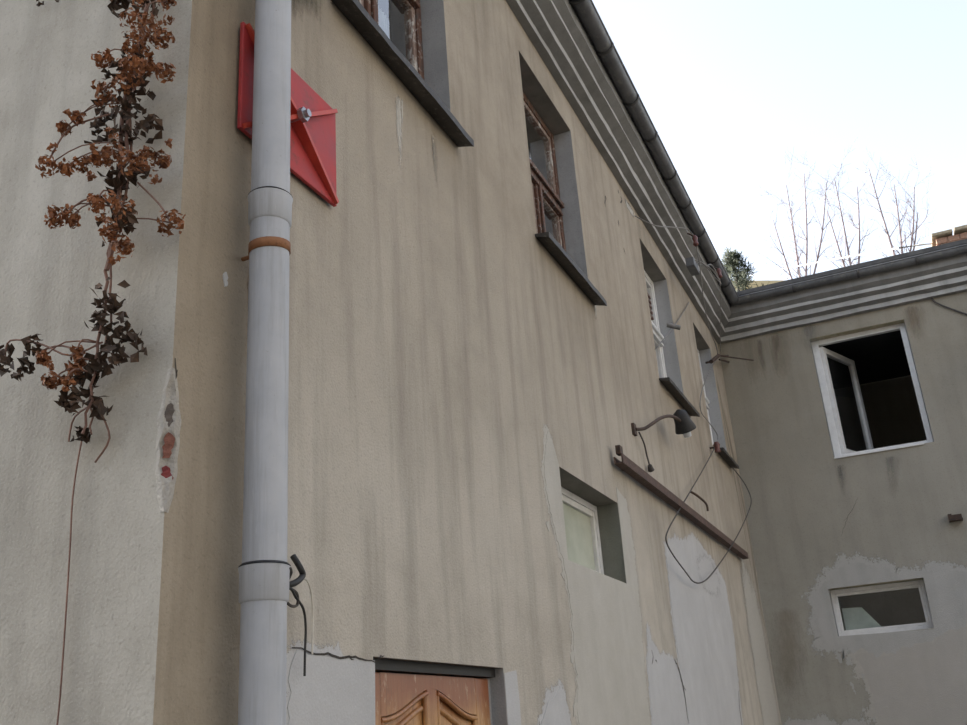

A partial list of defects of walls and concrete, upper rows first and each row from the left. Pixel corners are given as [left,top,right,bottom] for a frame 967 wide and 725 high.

flaking render [155,368,181,513]